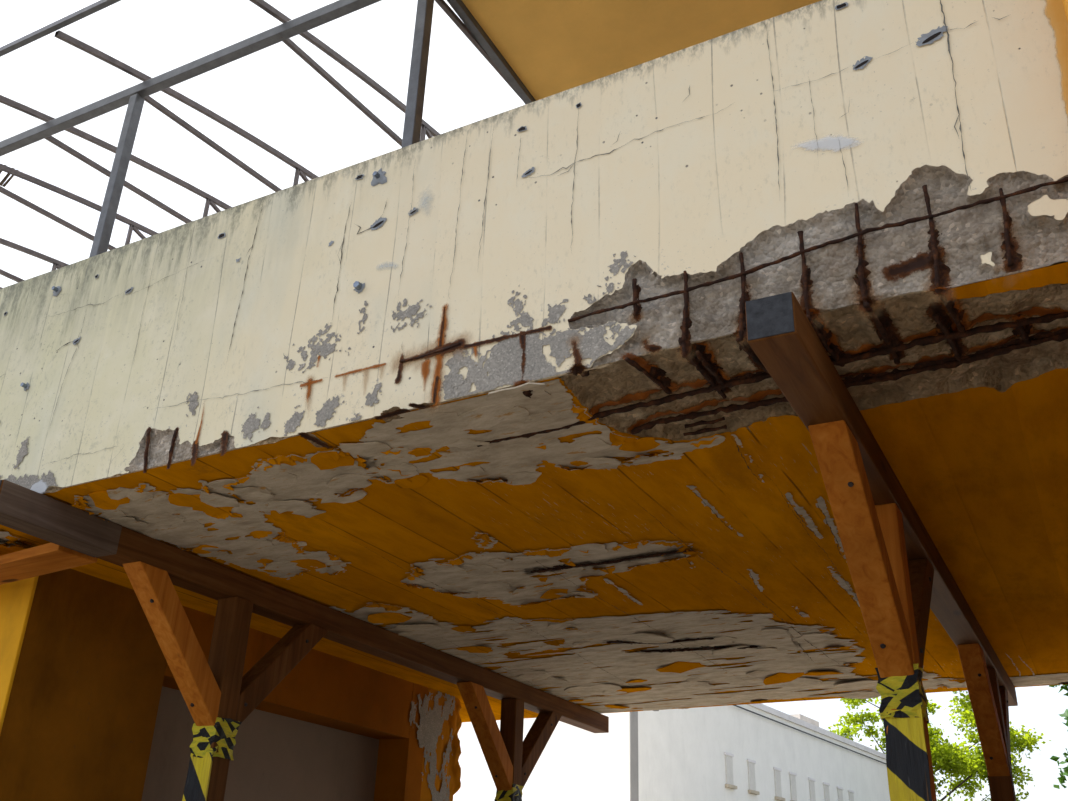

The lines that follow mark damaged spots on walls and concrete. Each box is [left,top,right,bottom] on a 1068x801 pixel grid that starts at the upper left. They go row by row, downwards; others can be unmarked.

crack [940,0,1009,189]
crack [448,132,493,296]
crack [517,86,729,251]
rust [300,355,322,399]
rust [335,363,386,377]
rust [395,304,552,407]
spalling [0,165,1068,580]
rust [643,340,662,352]
peeling [330,532,881,713]
peeling [922,667,967,690]
peeling [1009,673,1068,687]
spalling [409,688,462,801]